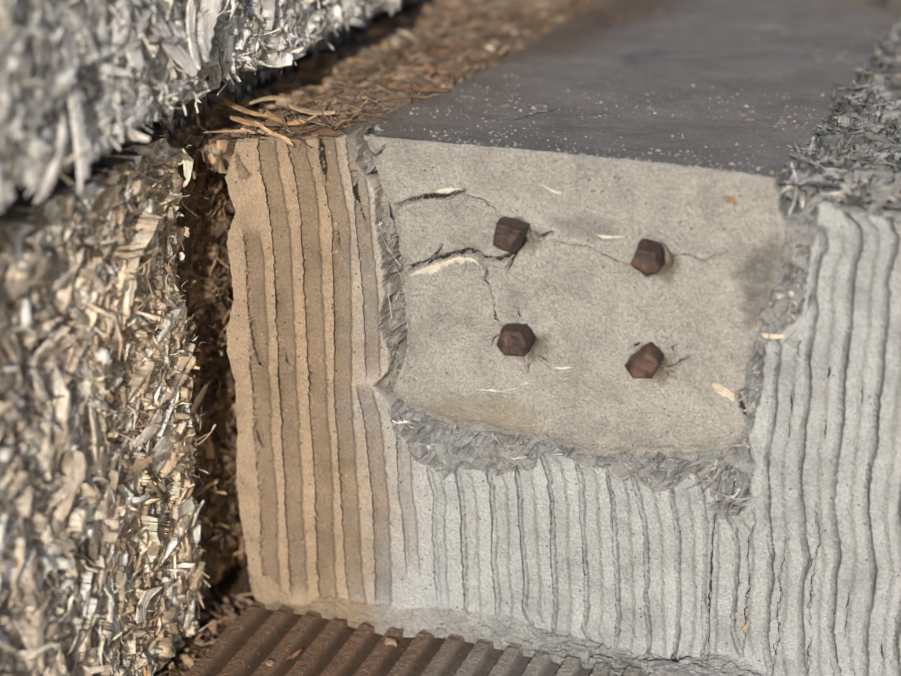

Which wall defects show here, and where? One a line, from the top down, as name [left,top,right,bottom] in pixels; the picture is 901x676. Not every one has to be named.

crack [399,190,496,210]
crack [410,231,632,344]
spalling [353,125,854,520]